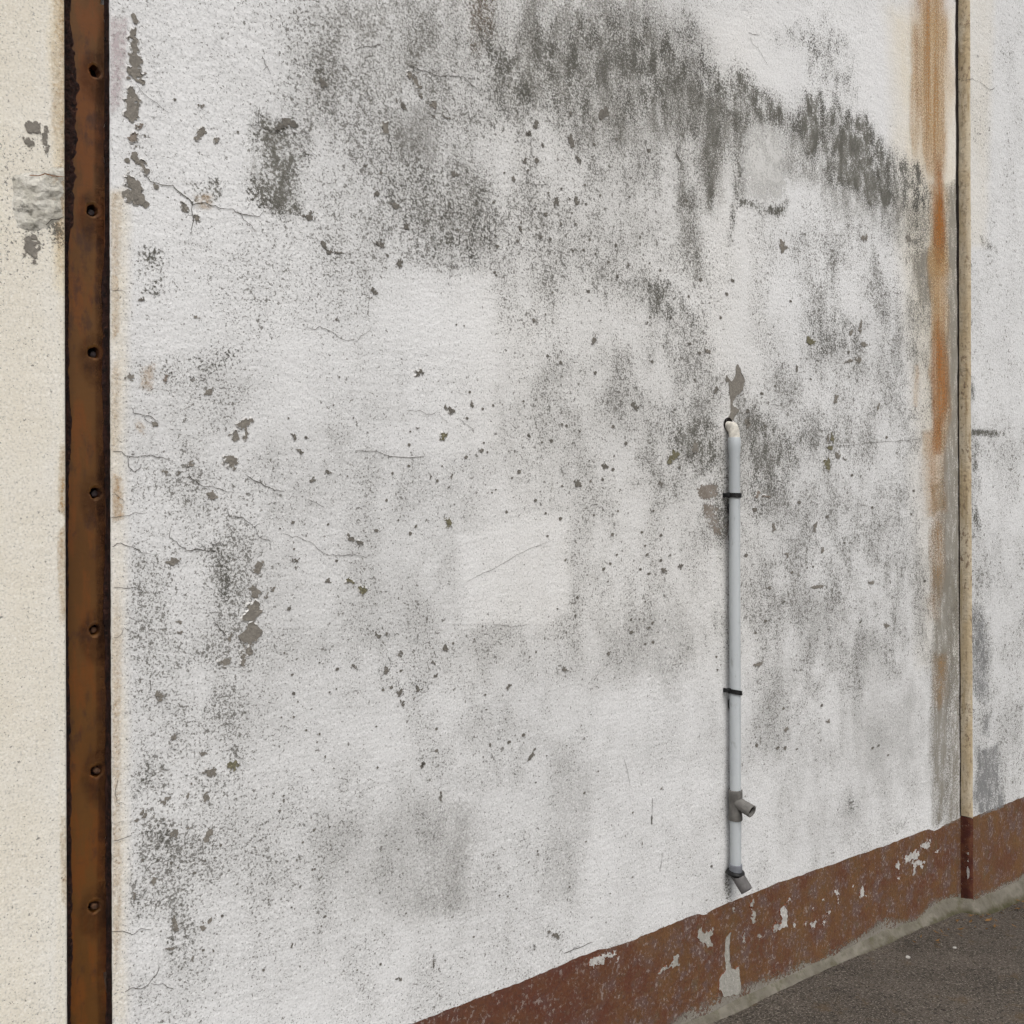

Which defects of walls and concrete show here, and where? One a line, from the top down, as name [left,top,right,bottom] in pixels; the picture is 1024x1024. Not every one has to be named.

peeling [22,120,50,153]
peeling [122,13,159,208]
crack [143,174,266,233]
damp [246,110,310,221]
corrosion [914,0,948,501]
damp [307,0,989,826]
corrosion [99,0,124,1024]
crack [113,451,358,556]
damp [196,536,251,605]
peeling [216,560,276,669]
damp [974,745,1004,815]
peeling [697,889,840,997]